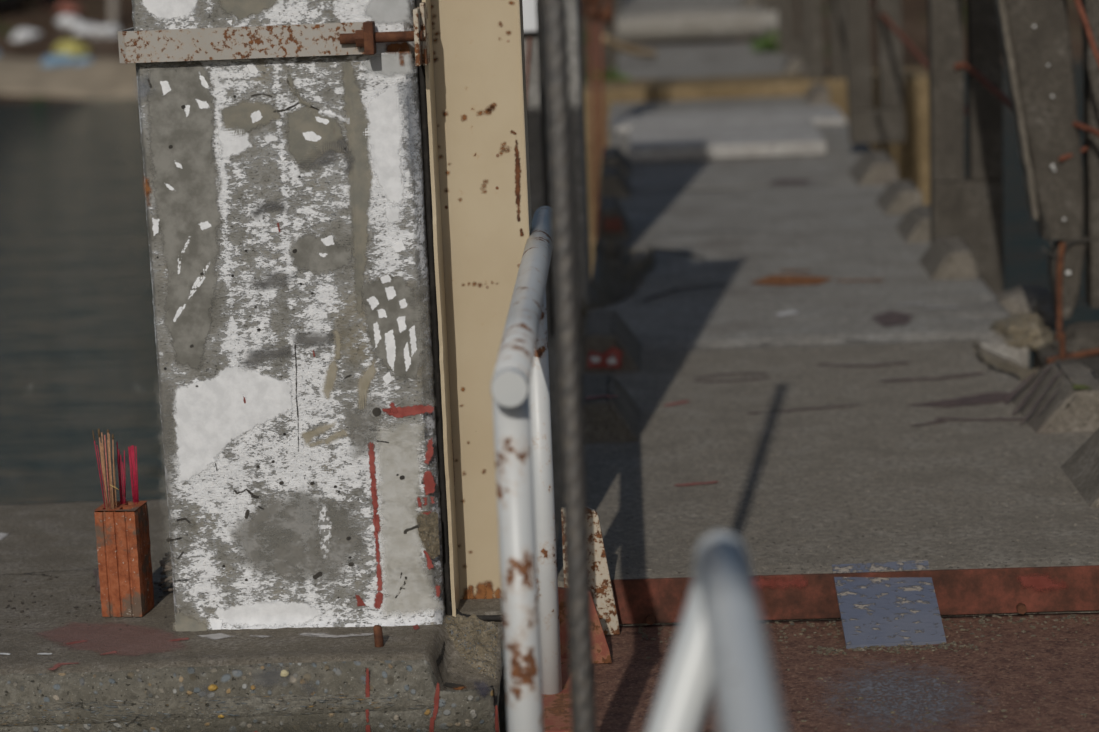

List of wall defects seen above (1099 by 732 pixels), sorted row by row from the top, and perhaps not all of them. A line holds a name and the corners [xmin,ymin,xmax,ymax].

corrosion [386,42,410,65]
corrosion [500,130,524,236]
peeling [141,60,426,386]
peeling [425,438,434,464]
peeling [166,518,190,542]
spalling [404,497,440,569]
corrosion [463,582,502,599]
peeling [174,613,233,631]